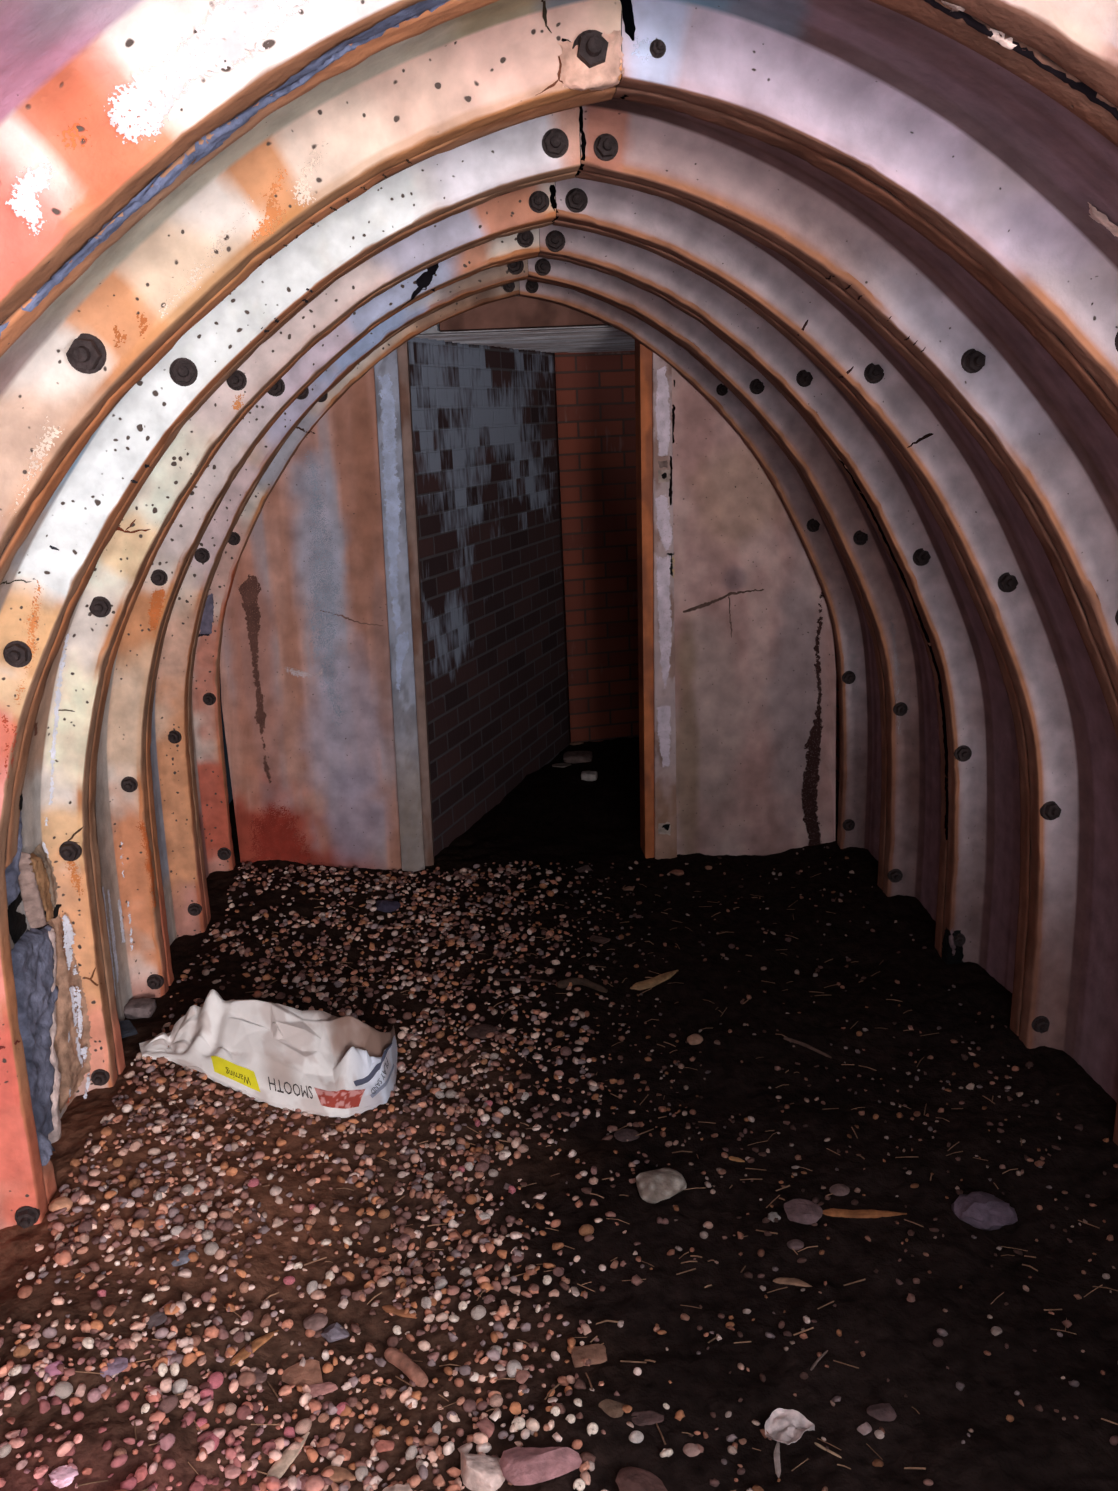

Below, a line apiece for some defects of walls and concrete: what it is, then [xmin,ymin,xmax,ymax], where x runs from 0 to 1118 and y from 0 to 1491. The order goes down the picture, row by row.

crack [620,0,636,41]
spalling [0,0,450,336]
crack [398,264,439,310]
peeling [2,415,62,516]
crack [907,433,933,448]
crack [683,589,764,638]
crack [838,458,949,840]
corrosion [245,800,326,866]
spalling [5,795,62,1166]